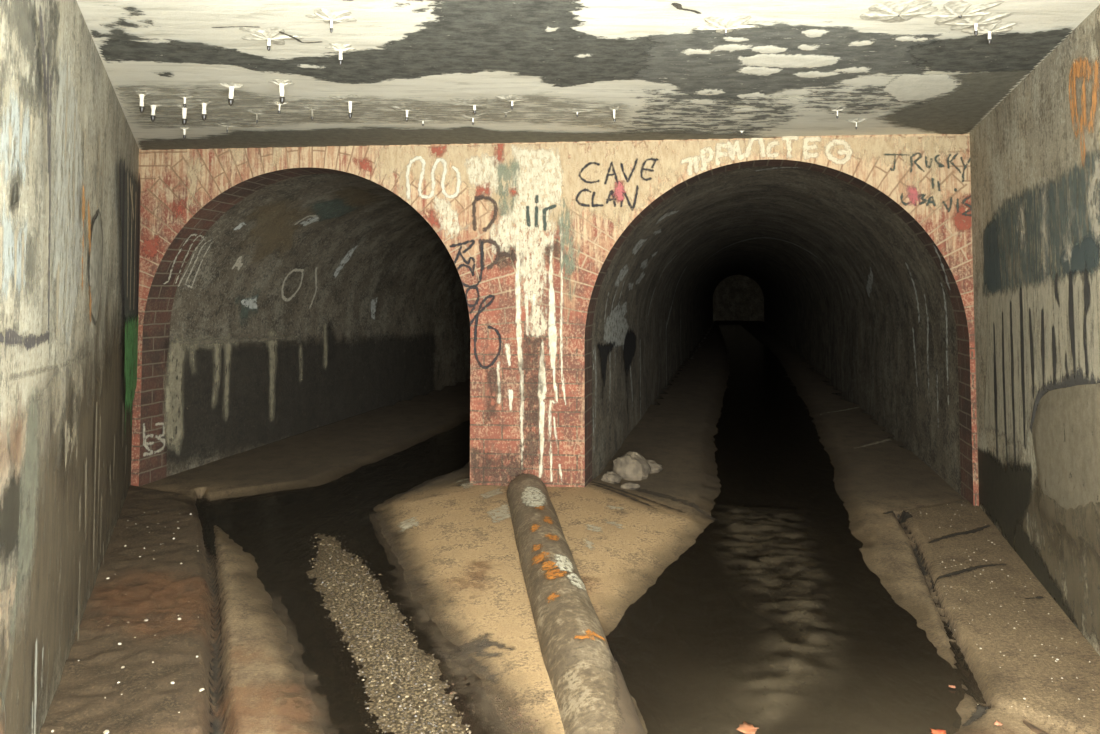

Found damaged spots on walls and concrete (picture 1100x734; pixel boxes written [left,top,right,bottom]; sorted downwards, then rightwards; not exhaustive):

peeling [91,0,1073,135]
damp [138,69,1034,482]